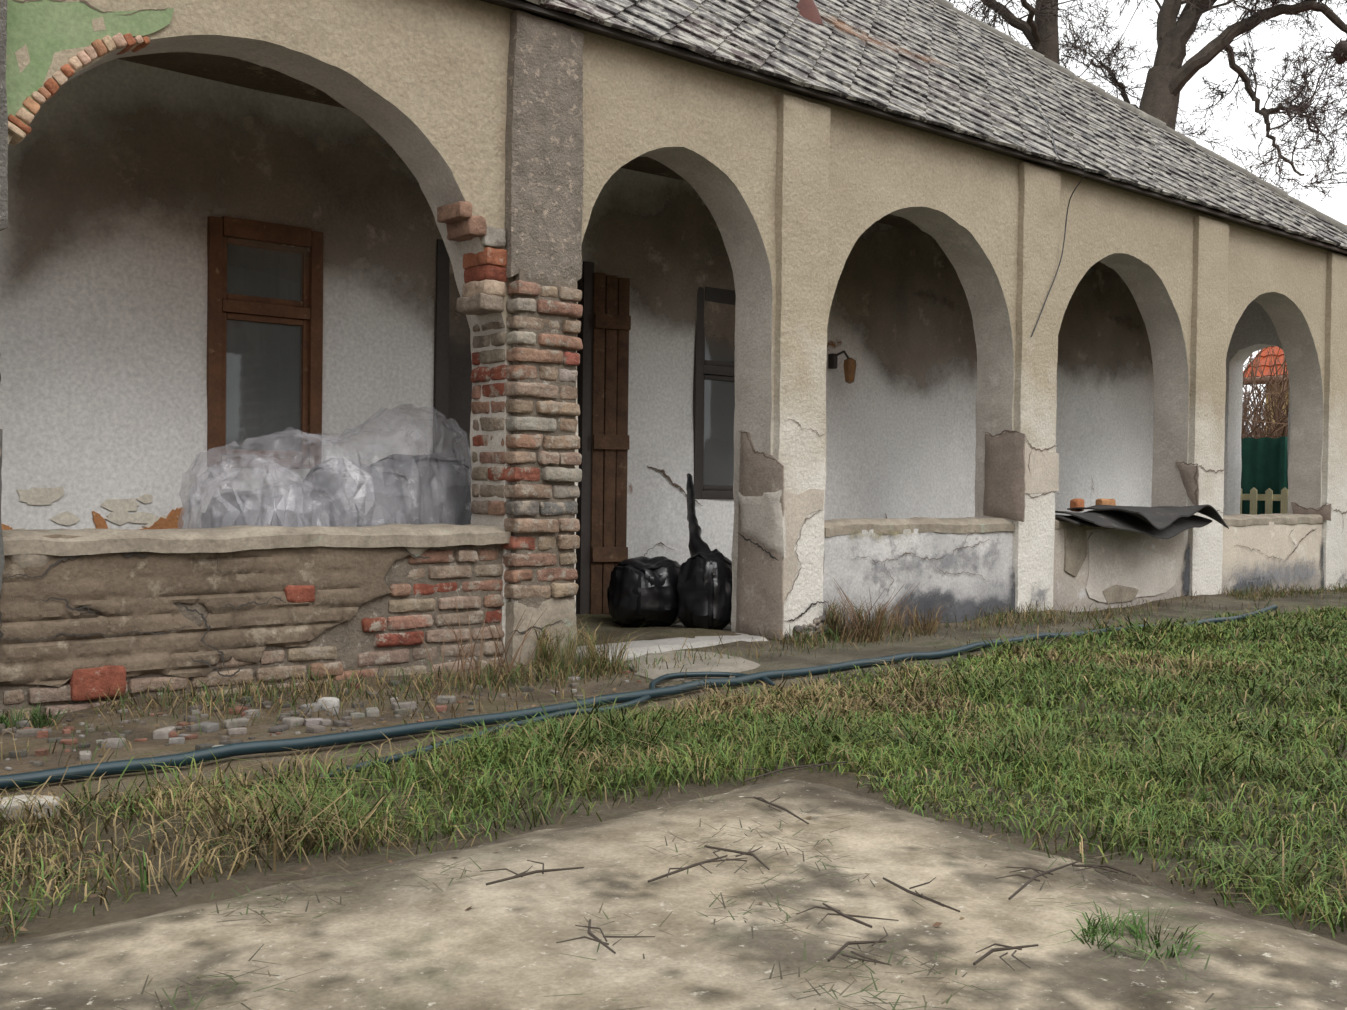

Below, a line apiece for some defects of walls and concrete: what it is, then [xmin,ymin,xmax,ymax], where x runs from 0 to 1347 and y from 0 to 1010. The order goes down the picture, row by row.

peeling [6,0,174,145]
crack [121,550,154,558]
spalling [3,201,583,721]
crack [647,466,703,506]
spalling [735,430,828,640]
spalling [983,430,1059,522]
crack [0,555,290,677]